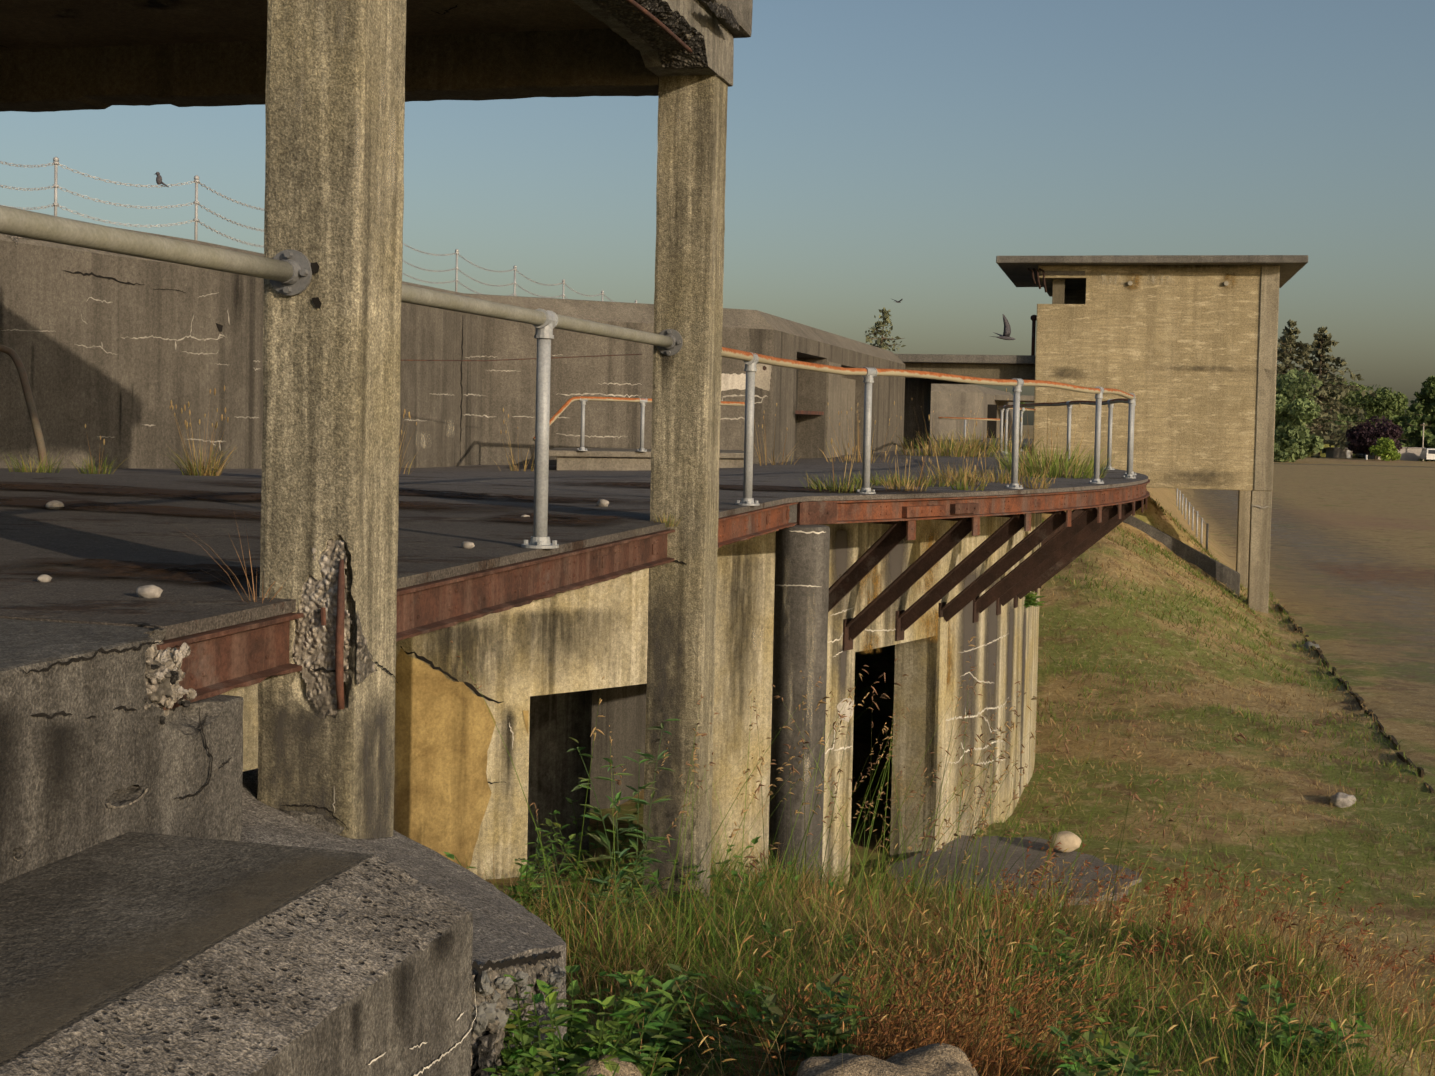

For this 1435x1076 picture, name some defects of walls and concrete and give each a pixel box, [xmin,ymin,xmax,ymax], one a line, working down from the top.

spalling [592,0,710,69]
crack [3,270,261,371]
crack [31,706,136,719]
spalling [143,641,197,725]
crack [174,707,232,800]
spalling [292,540,377,719]
crack [311,646,514,749]
peeling [393,648,496,869]
damp [437,627,478,682]